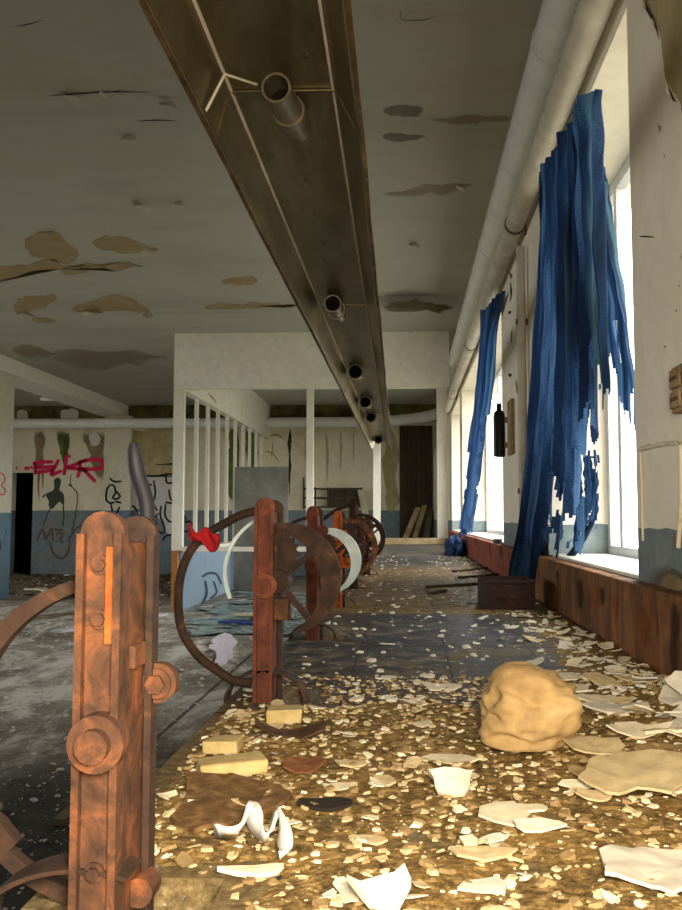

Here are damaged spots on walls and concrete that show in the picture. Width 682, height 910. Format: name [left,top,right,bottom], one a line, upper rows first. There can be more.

peeling [642,0,682,108]
crack [51,88,149,96]
peeling [0,231,159,282]
peeling [14,294,57,324]
peeling [69,294,152,318]
peeling [205,301,296,310]
water stain [34,433,45,496]
rust [670,606,678,672]